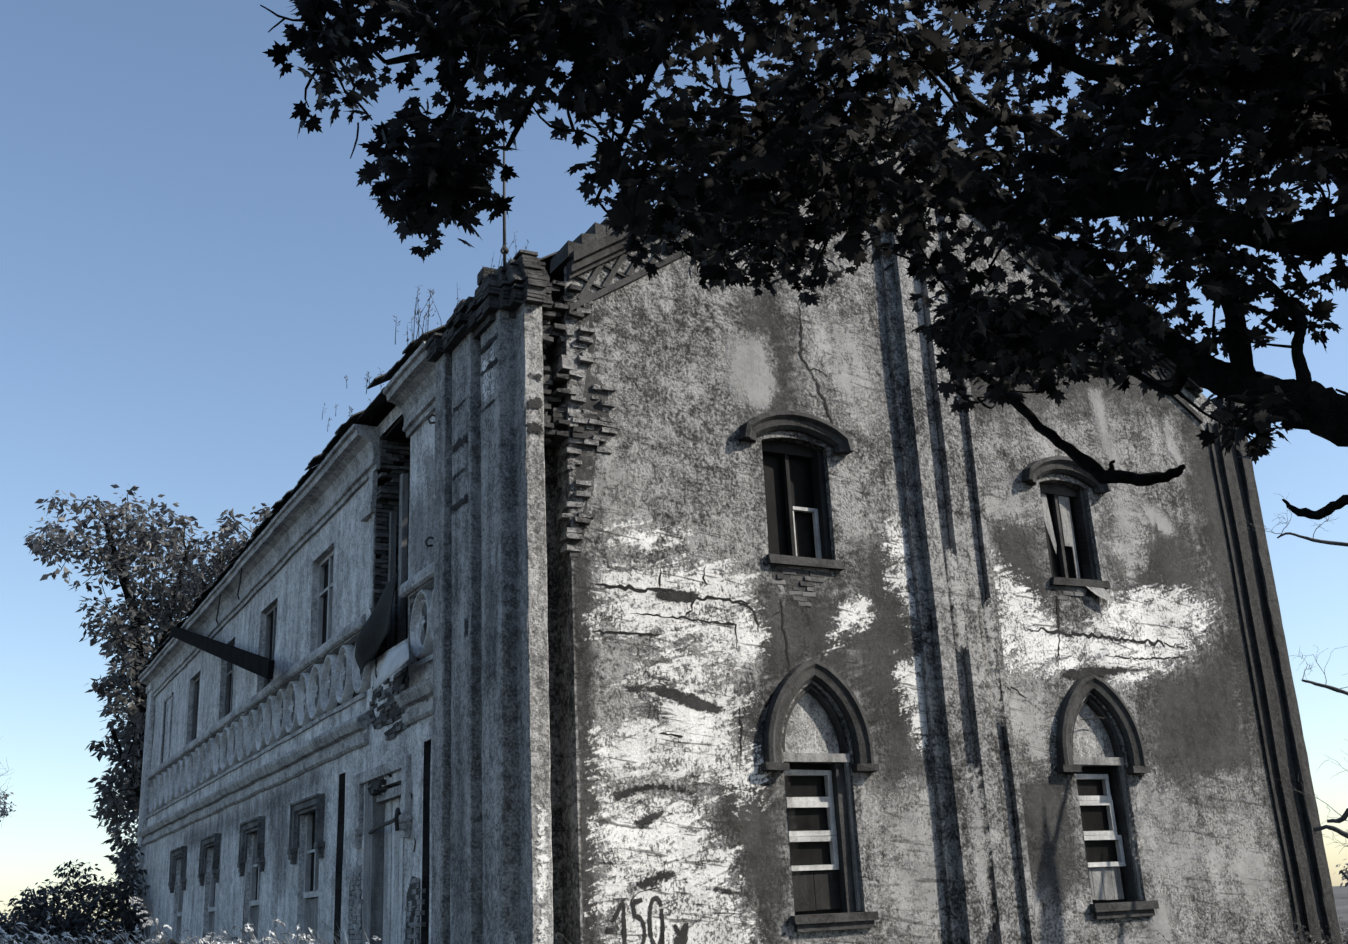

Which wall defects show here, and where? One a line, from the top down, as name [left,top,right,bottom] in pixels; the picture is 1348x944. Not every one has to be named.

water stain [574,554,601,944]
crack [590,566,790,671]
water stain [717,534,932,933]
crack [1024,593,1188,665]
water stain [970,338,1295,924]